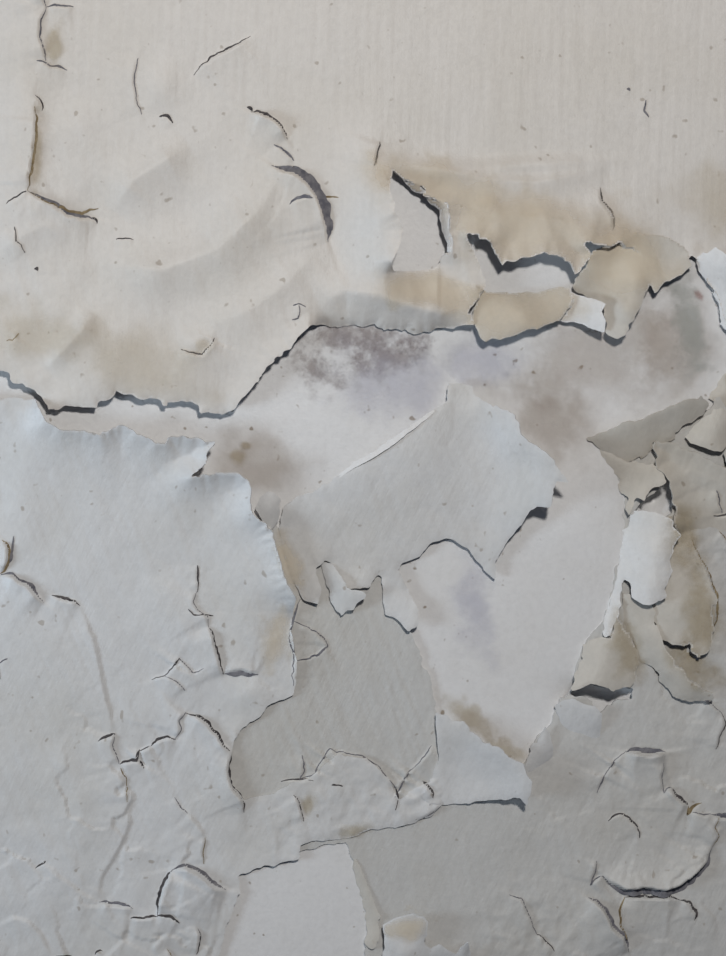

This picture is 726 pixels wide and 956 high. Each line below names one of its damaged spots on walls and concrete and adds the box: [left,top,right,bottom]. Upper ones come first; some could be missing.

crack [6,95,98,223]
crack [247,106,338,240]
damp [404,169,587,257]
damp [477,298,564,329]
damp [595,232,658,286]
peeling [0,107,726,738]
crack [0,536,80,606]
crack [98,565,258,812]
peeling [421,713,554,806]
crack [101,840,226,953]
peeling [353,859,471,956]
crack [588,747,726,952]